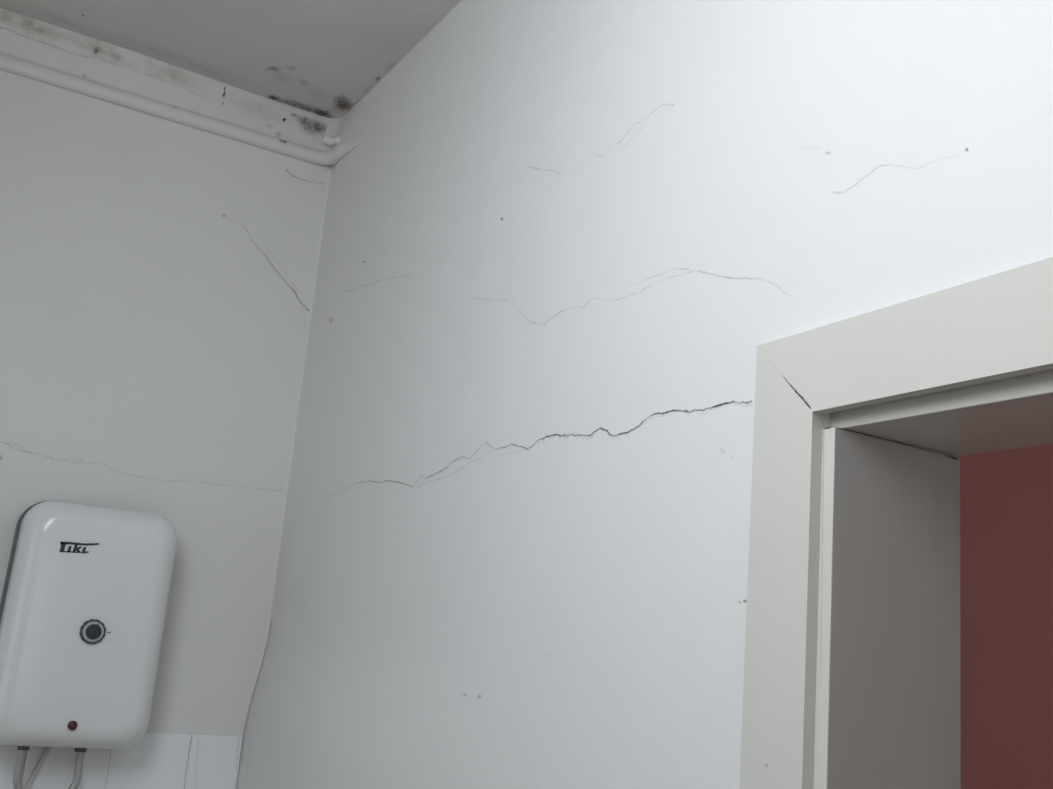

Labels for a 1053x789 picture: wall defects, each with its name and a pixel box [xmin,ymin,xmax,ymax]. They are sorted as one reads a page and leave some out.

crack [504,401,751,449]